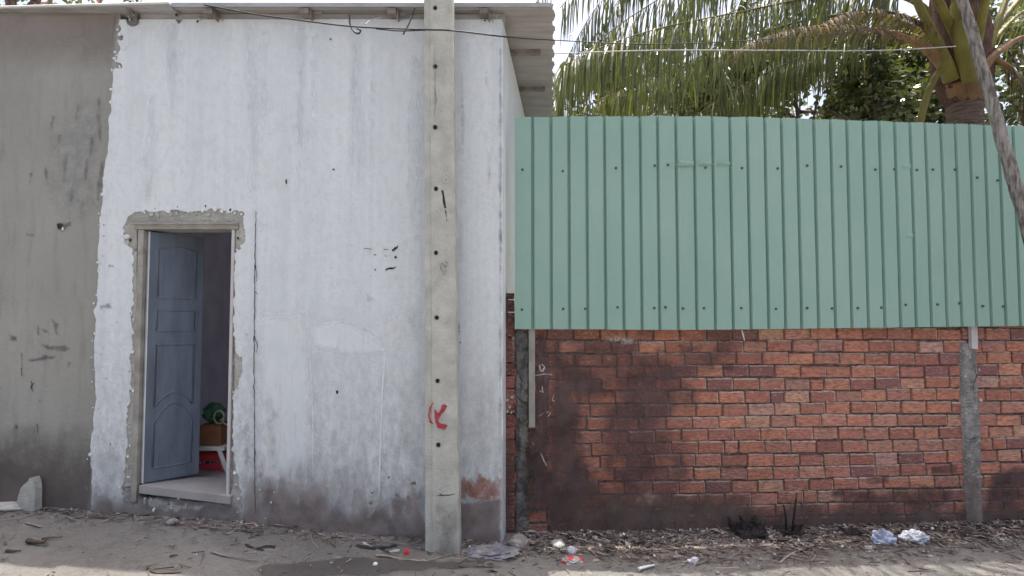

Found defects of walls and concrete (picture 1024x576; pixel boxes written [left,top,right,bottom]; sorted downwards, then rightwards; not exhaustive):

leakage [0,443,425,544]
leakage [257,492,513,576]